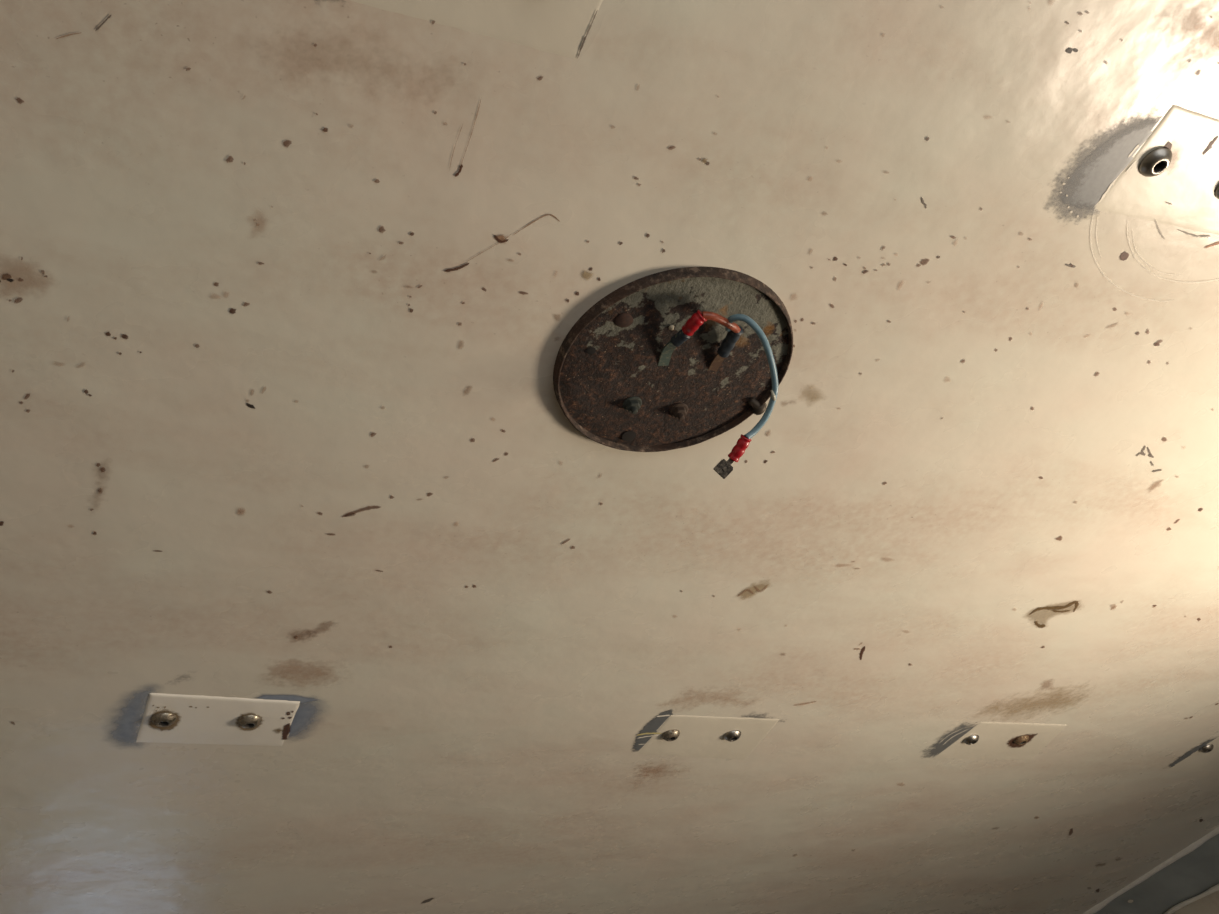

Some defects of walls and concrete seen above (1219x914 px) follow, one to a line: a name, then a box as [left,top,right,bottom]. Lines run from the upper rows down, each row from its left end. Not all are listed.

peeling [1048,117,1161,219]